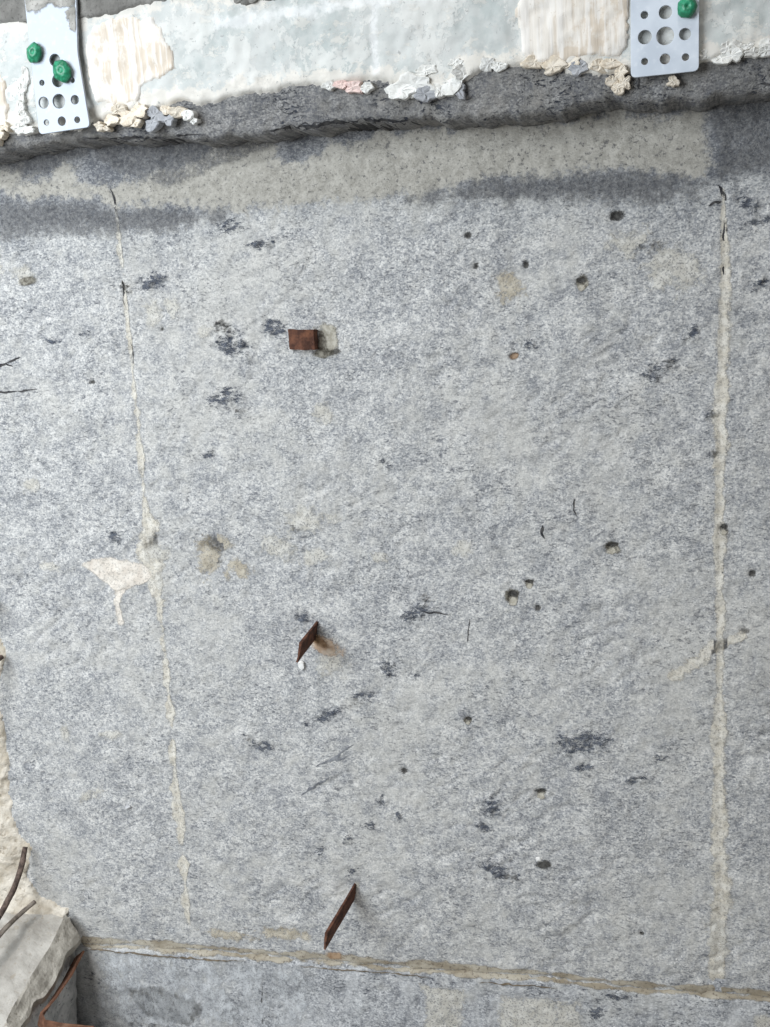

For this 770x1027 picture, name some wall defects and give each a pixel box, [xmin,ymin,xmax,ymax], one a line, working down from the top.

peeling [699,38,770,66]
peeling [321,55,631,103]
peeling [666,75,680,88]
peeling [0,66,39,146]
peeling [93,102,201,133]
crack [110,189,190,925]
crack [667,185,746,981]
rust [313,636,350,677]
spalling [0,711,69,917]
crack [86,948,237,962]